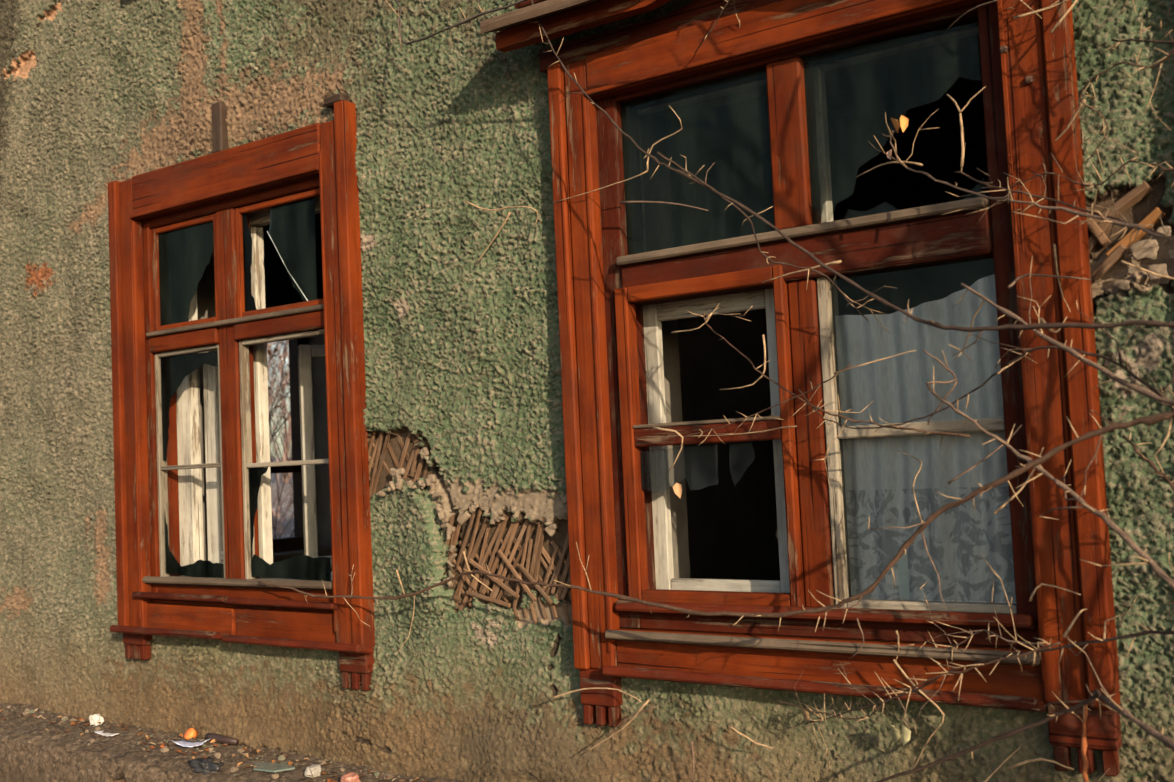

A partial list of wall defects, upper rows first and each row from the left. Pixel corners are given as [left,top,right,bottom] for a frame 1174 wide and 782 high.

crack [0,0,63,81]
flaking render [1086,174,1174,313]
peeling [1104,329,1174,422]
flaking render [367,427,572,649]